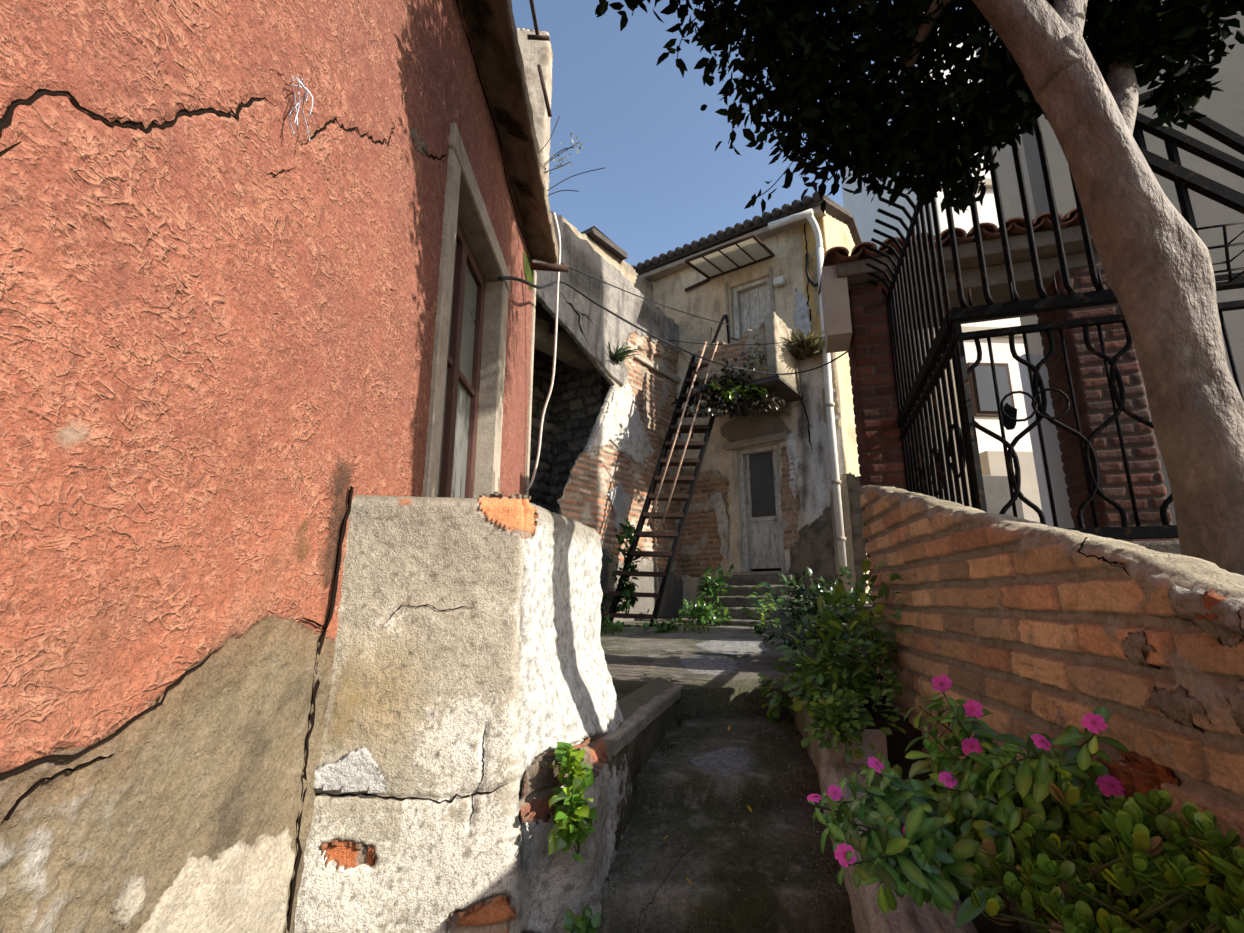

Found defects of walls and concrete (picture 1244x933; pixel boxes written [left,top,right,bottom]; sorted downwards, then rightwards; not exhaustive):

crack [0,68,285,156]
crack [268,117,464,177]
spalling [557,332,730,580]
spalling [478,491,539,541]
crack [1077,537,1130,576]
spalling [1195,588,1226,621]
crack [285,485,516,933]
peeling [0,616,387,933]
spalling [519,751,569,825]
spalling [573,732,621,782]
spalling [446,895,535,933]